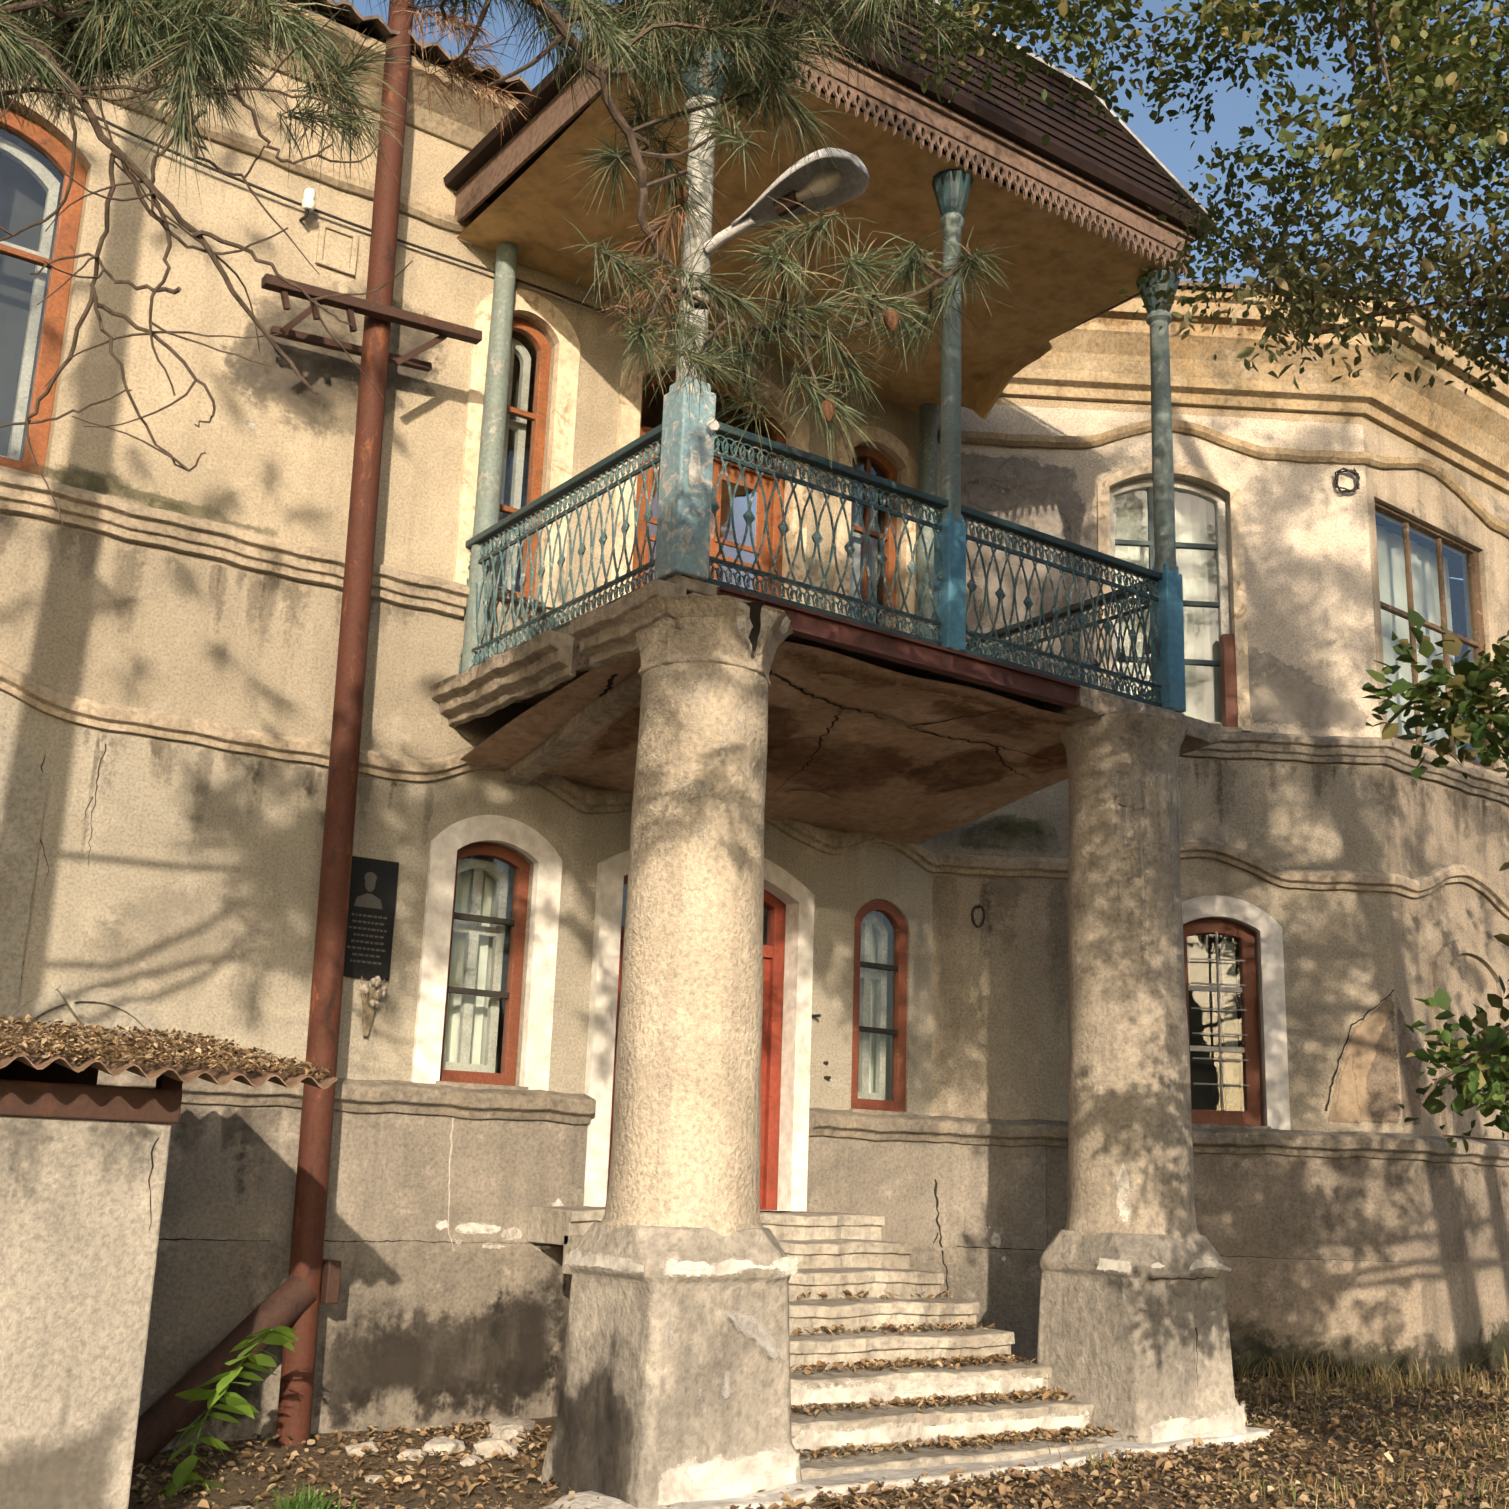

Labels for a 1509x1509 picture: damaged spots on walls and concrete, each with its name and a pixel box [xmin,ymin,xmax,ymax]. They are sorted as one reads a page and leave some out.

crack [769,670,1051,793]
crack [82,744,106,866]
peeling [1325,989,1427,1125]
crack [933,1179,1036,1298]
crack [1149,1255,1406,1280]
leakage [192,1377,262,1426]
leakage [324,1274,628,1502]
leakage [1229,1321,1509,1385]